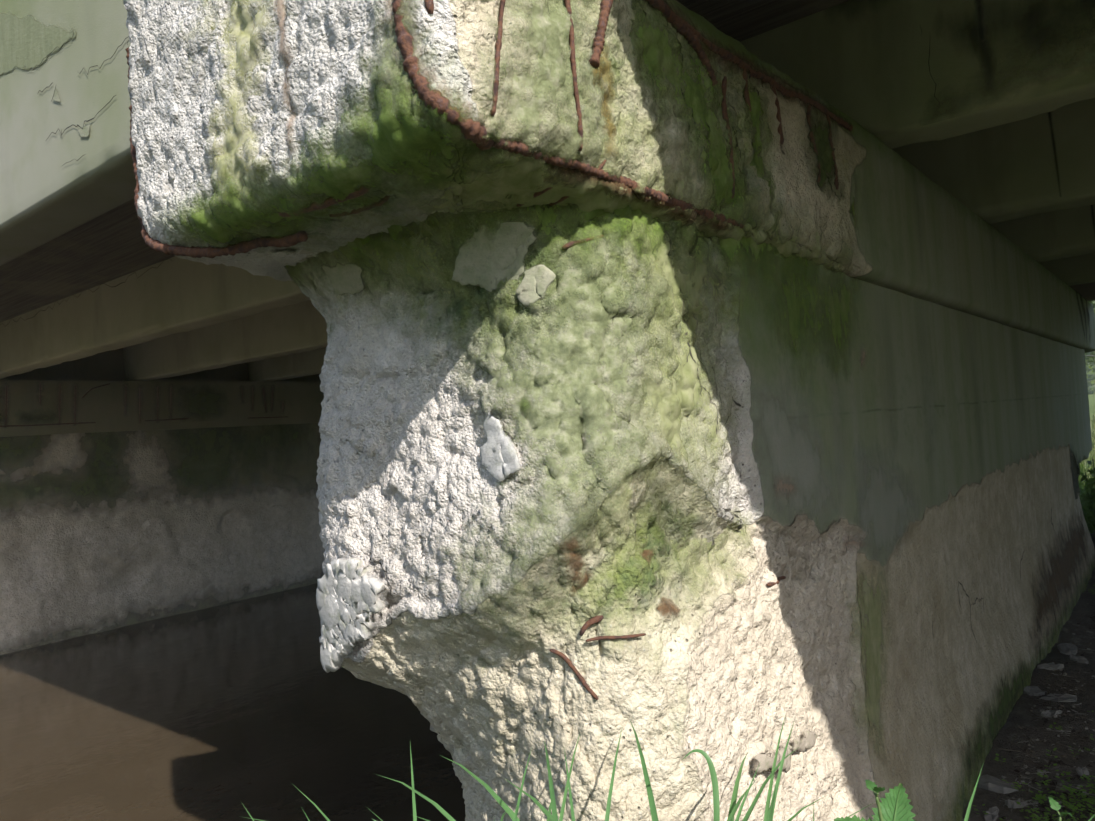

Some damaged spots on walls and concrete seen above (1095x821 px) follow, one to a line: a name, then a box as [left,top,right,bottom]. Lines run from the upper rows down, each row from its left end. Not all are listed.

crack [47,95,116,166]
rust [276,0,295,151]
rust [593,50,616,151]
spalling [403,0,873,277]
rust [552,165,729,231]
spalling [0,0,764,663]
rust [566,540,590,590]
rust [657,598,679,615]
spalling [341,444,1095,821]
damp [1034,517,1087,648]